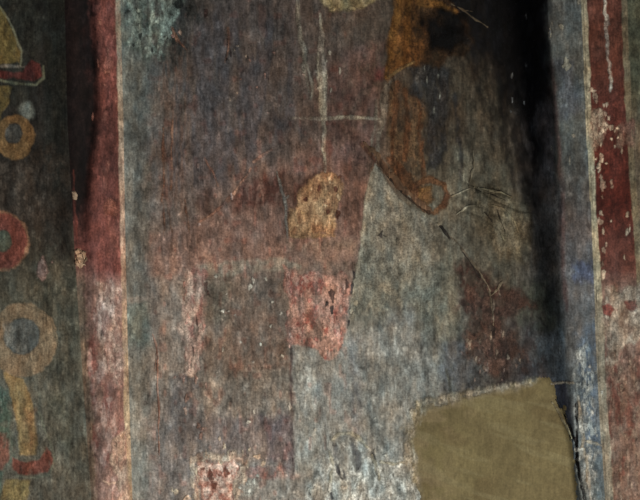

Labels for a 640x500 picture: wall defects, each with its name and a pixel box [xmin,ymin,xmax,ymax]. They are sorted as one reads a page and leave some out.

peeling [588,87,635,199]
crack [360,141,503,326]
crack [555,399,584,500]